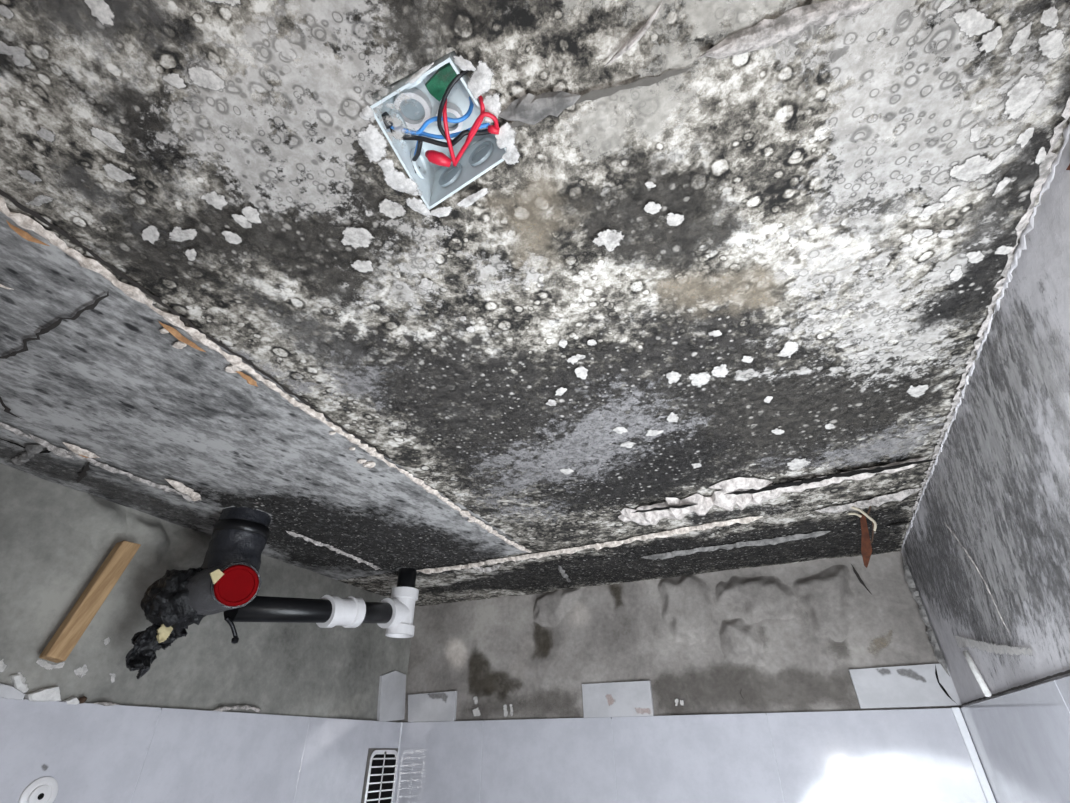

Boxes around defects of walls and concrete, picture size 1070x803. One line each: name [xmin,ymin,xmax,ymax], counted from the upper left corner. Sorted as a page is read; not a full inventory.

water stain [0,0,1070,531]
crack [0,292,109,359]
crack [0,397,24,420]
peeling [546,387,567,406]
peeling [558,339,597,380]
peeling [646,412,679,436]
peeling [666,364,729,388]
peeling [777,339,799,358]
peeling [907,384,930,398]
water stain [168,302,1070,657]
spalling [618,458,936,525]
corrosion [848,499,877,568]